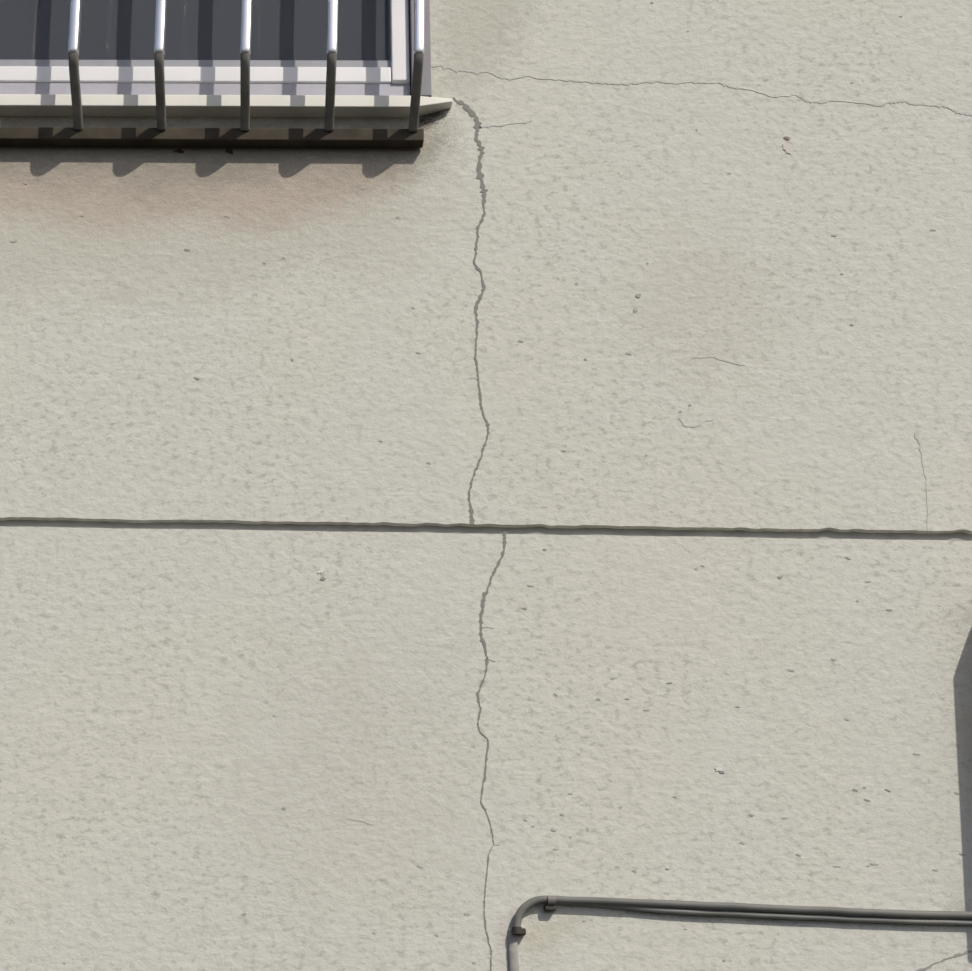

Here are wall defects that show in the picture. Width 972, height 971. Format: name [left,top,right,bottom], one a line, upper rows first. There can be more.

crack [431,62,972,116]
crack [453,97,531,525]
crack [914,427,928,517]
crack [476,532,507,971]
crack [916,950,972,971]